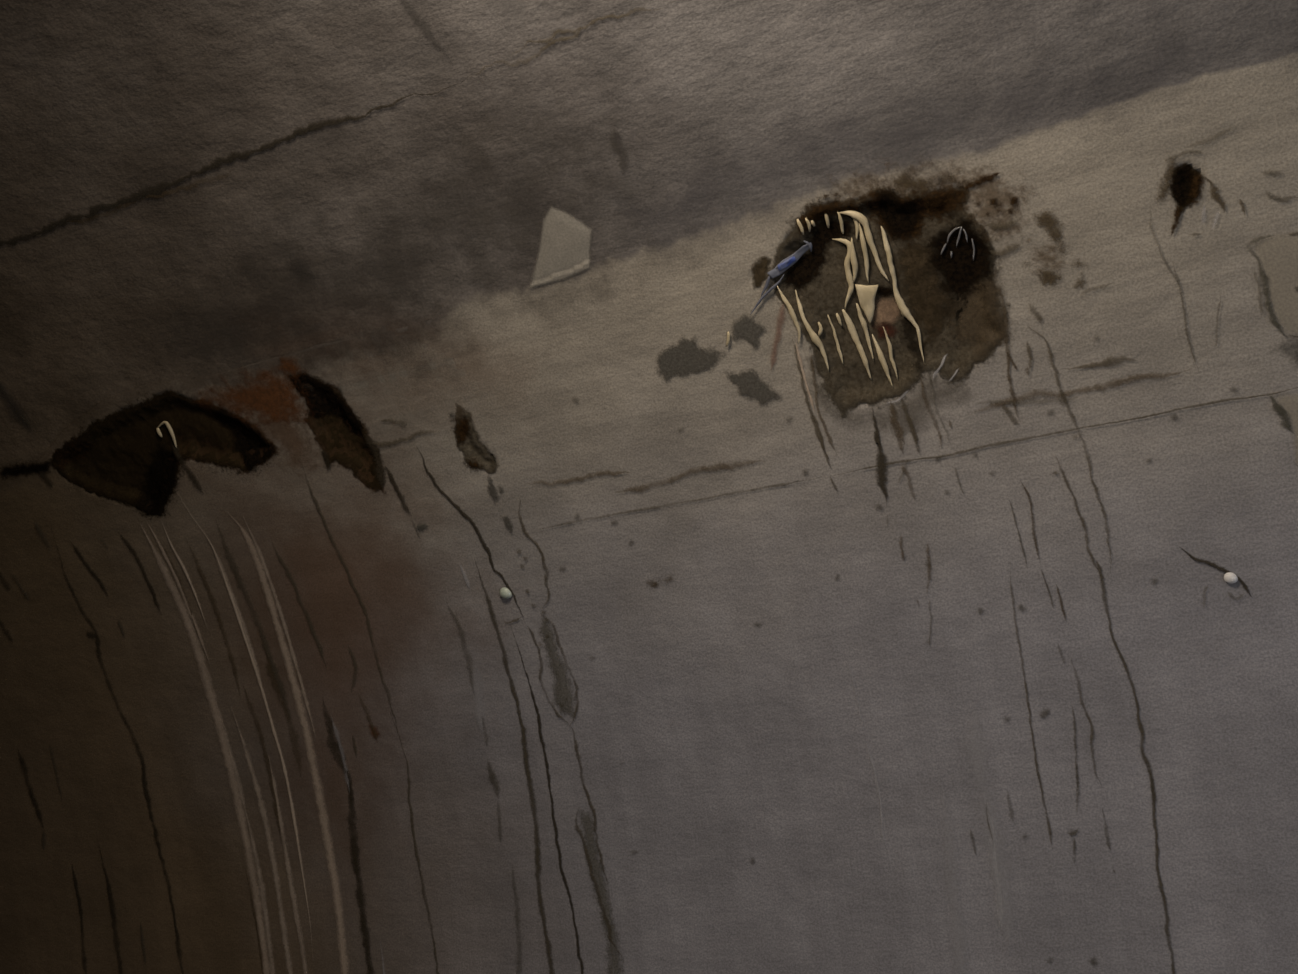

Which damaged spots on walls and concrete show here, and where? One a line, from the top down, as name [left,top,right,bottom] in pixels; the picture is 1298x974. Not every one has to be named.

crack [0,61,499,246]
spalling [1157,159,1245,236]
spalling [752,186,1010,418]
peeling [1255,235,1298,337]
spalling [51,392,276,516]
spalling [287,372,386,492]
spalling [450,404,503,501]
crack [693,388,1294,506]
crack [1181,548,1252,597]
water stain [120,499,373,974]
water stain [308,484,439,974]
crack [417,448,584,974]